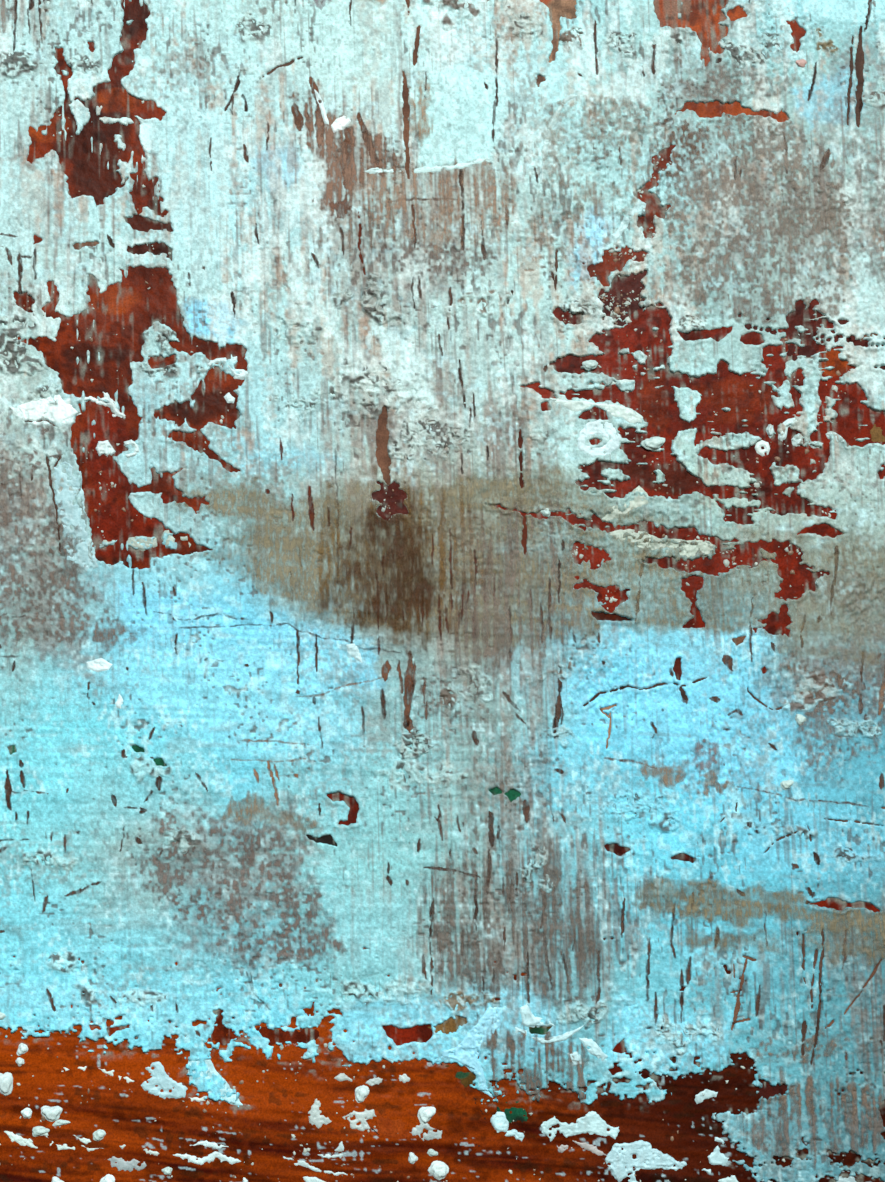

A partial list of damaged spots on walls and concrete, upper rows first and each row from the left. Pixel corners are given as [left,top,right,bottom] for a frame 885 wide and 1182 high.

spalling [421,0,586,63]
peeling [602,0,841,70]
peeling [675,101,789,122]
spalling [850,35,885,118]
peeling [0,0,406,572]
spalling [266,355,489,520]
peeling [489,145,885,646]
damp [177,453,755,747]
peeling [0,949,811,1182]
peeling [815,1150,885,1182]